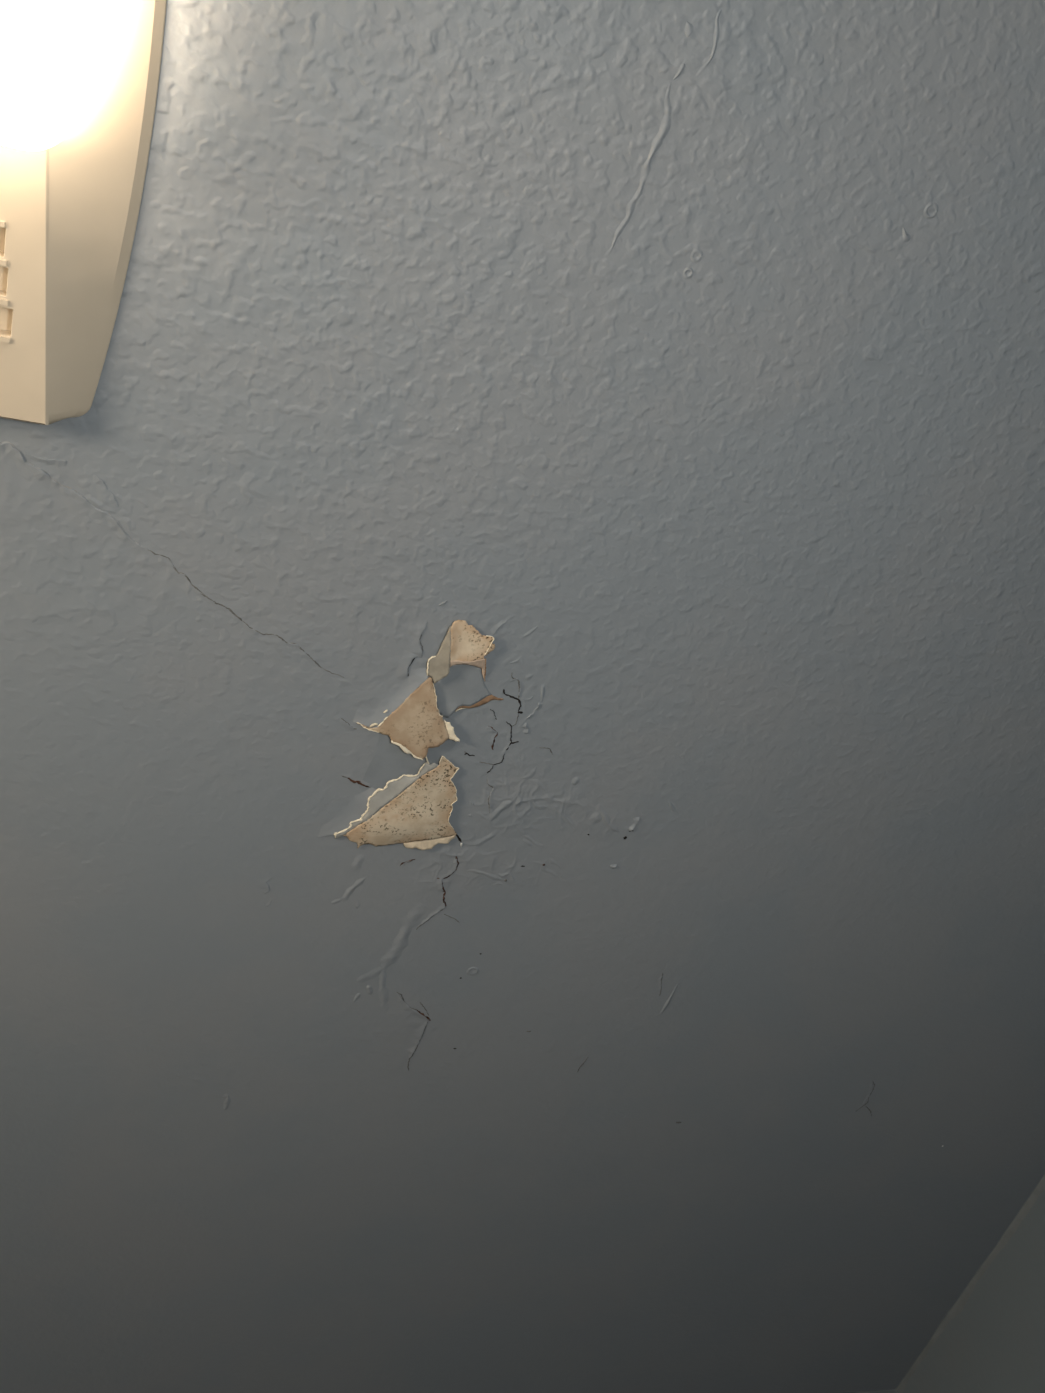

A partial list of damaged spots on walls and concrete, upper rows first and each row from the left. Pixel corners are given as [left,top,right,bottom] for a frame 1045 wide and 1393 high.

peeling [318,601,515,850]
crack [464,675,533,773]
crack [342,773,371,788]
crack [400,832,462,930]
crack [394,992,431,1071]